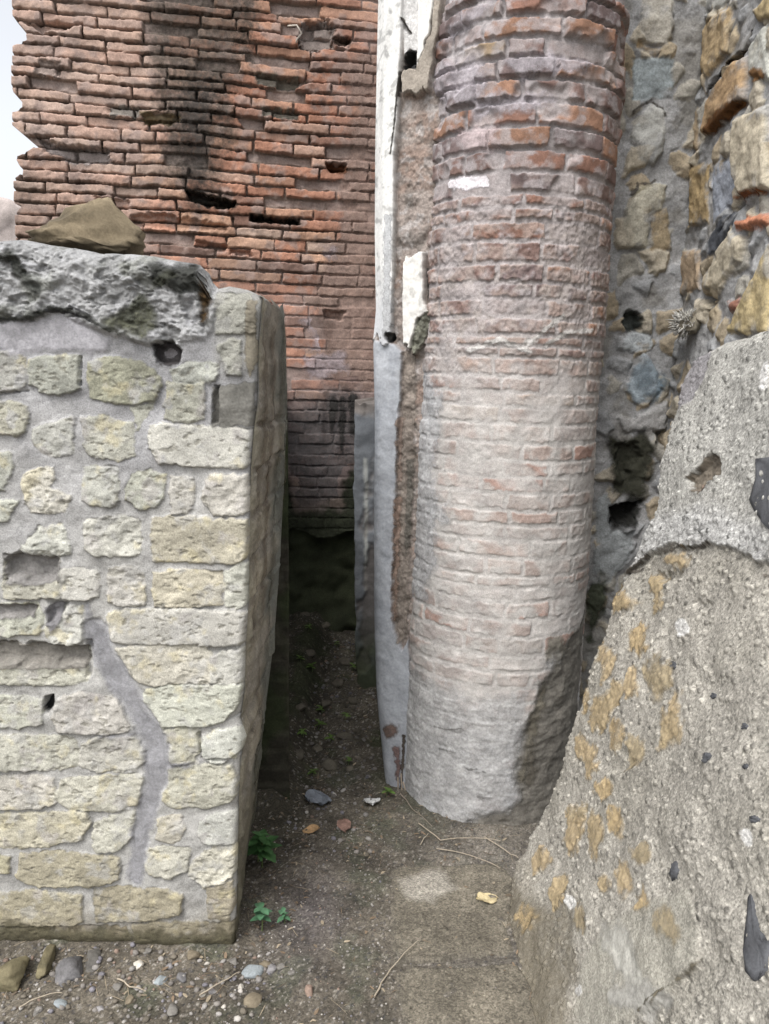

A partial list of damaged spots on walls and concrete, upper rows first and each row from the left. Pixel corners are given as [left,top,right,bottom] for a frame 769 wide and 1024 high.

spalling [185,189,237,210]
spalling [249,213,300,226]
spalling [153,340,182,366]
water stain [260,361,358,501]
spalling [686,451,722,494]
flaking render [391,350,449,644]
rust [383,724,401,780]